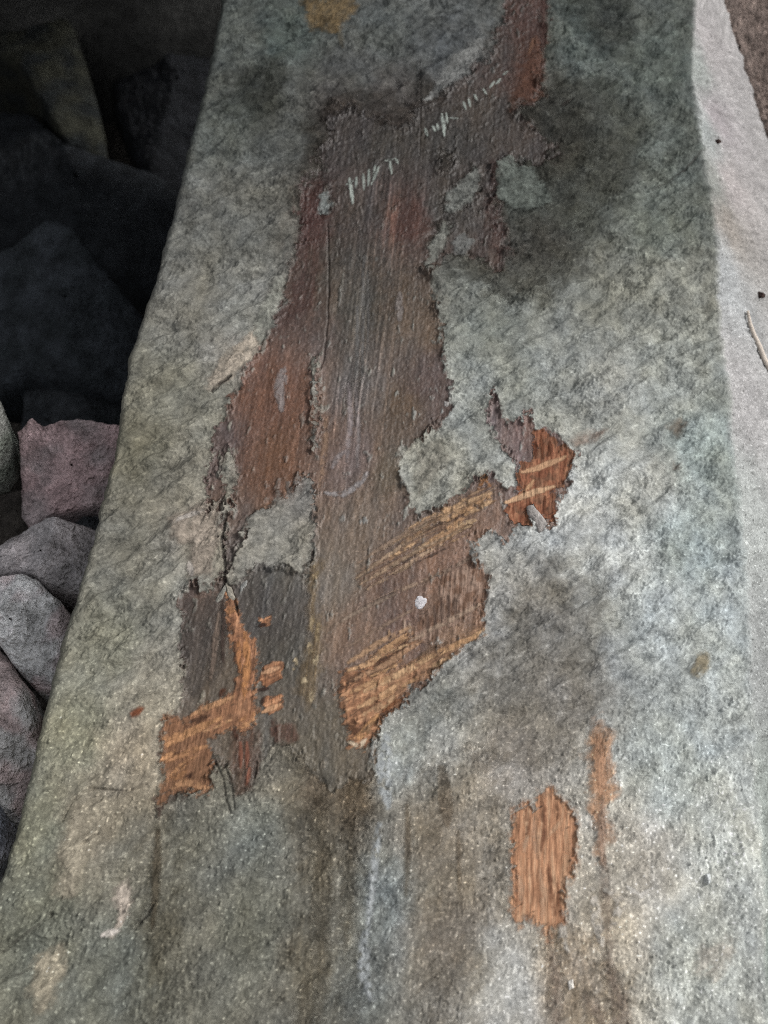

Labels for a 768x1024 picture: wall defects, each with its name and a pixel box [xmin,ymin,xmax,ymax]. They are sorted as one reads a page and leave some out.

peeling [152,786,194,806]
peeling [157,0,581,797]